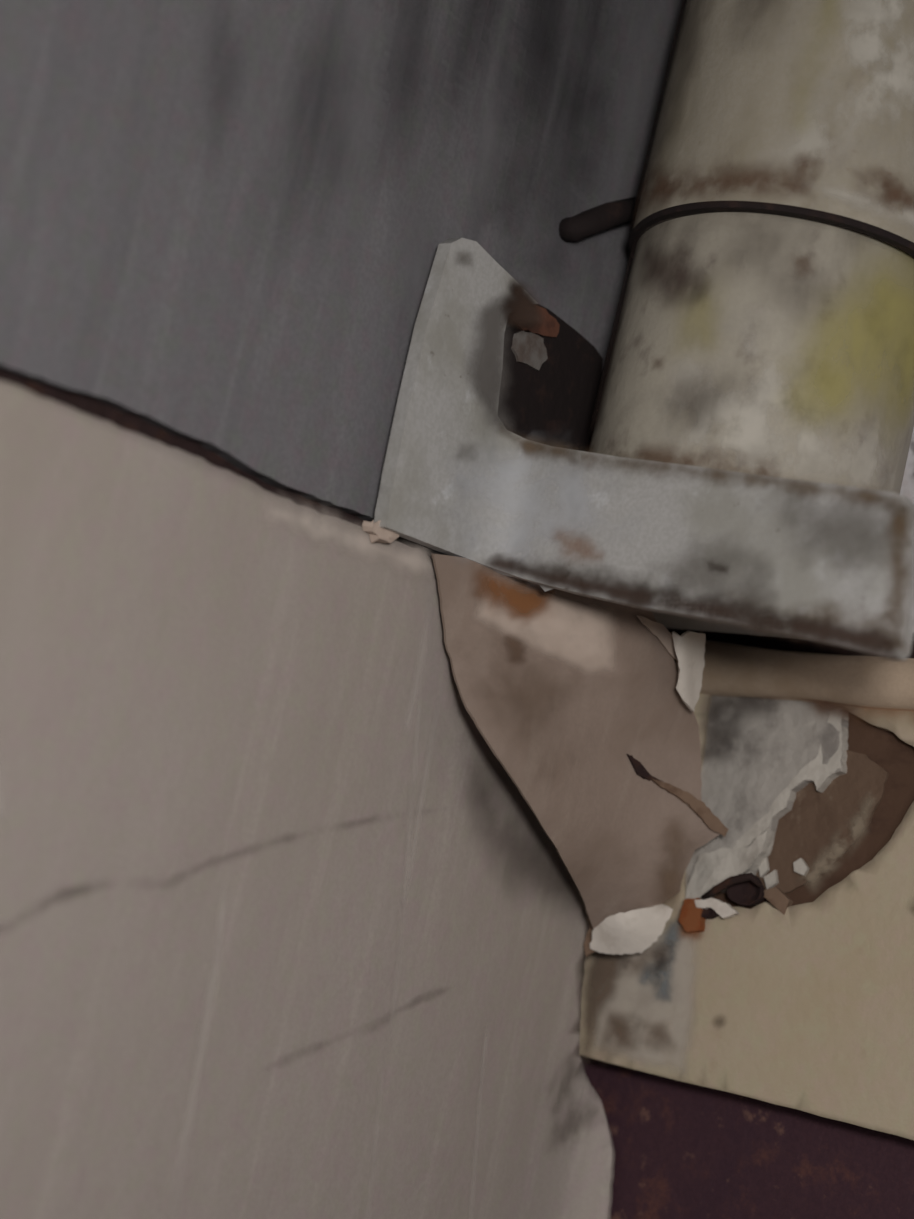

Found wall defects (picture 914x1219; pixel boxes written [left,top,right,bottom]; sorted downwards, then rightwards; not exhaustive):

corrosion [507,284,560,337]
corrosion [587,1,914,436]
spalling [685,695,914,915]